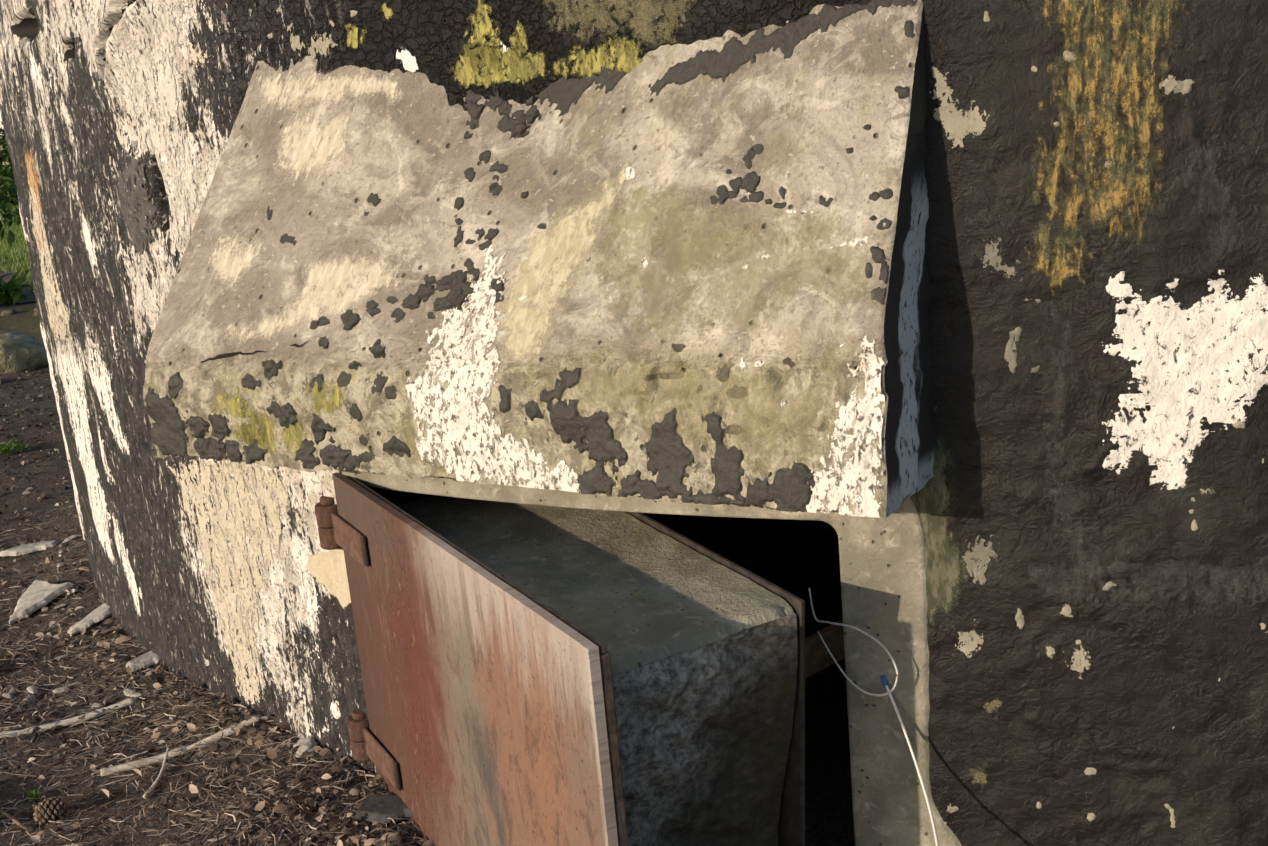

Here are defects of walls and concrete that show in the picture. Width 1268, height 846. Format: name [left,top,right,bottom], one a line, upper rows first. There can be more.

spalling [10,8,45,97]
spalling [50,0,216,256]
peeling [463,90,541,139]
peeling [930,67,990,148]
spalling [228,163,628,360]
peeling [19,182,142,618]
peeling [309,339,386,392]
peeling [295,403,411,472]
spalling [498,336,885,518]
peeling [1102,270,1268,531]
spalling [9,580,75,625]
spalling [67,603,111,636]